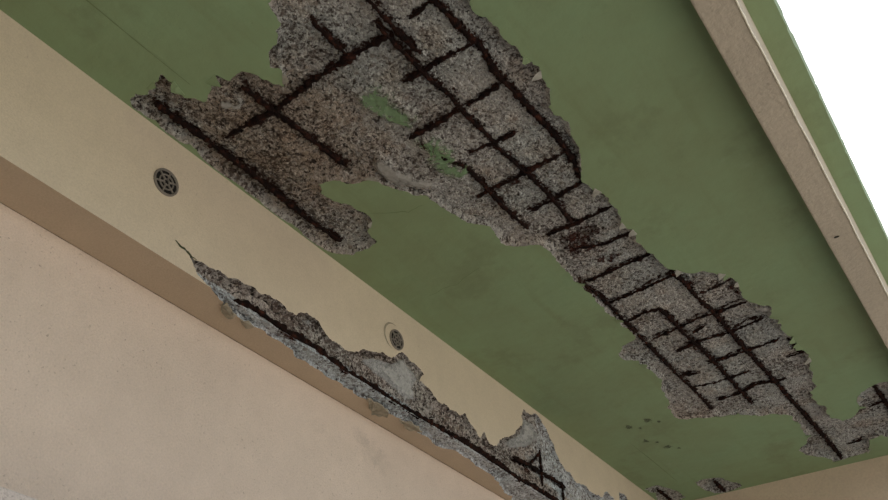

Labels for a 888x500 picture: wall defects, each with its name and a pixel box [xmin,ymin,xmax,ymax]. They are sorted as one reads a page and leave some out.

spalling [130,0,888,463]
spalling [645,485,686,500]
spalling [695,478,741,493]